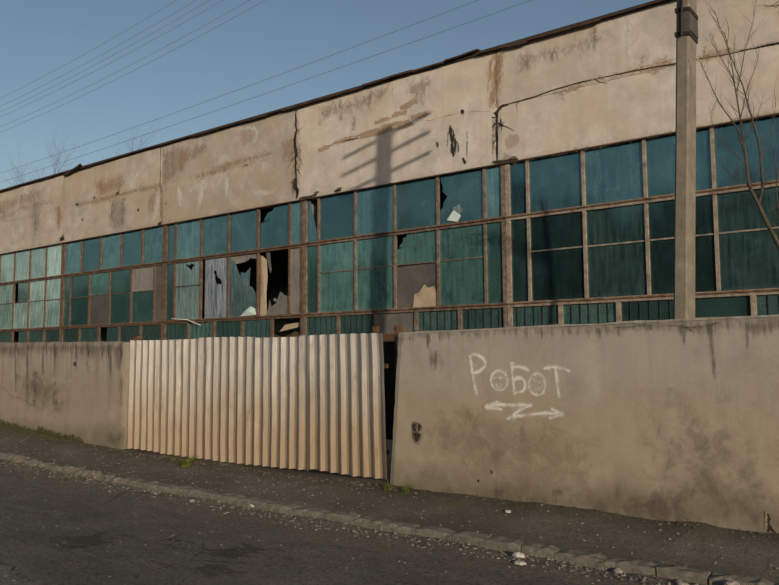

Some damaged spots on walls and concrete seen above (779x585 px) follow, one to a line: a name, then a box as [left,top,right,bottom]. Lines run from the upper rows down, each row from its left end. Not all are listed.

crack [696,42,779,60]
peeling [318,98,428,152]
crack [409,63,676,160]
crack [288,111,302,198]
spalling [411,421,423,445]